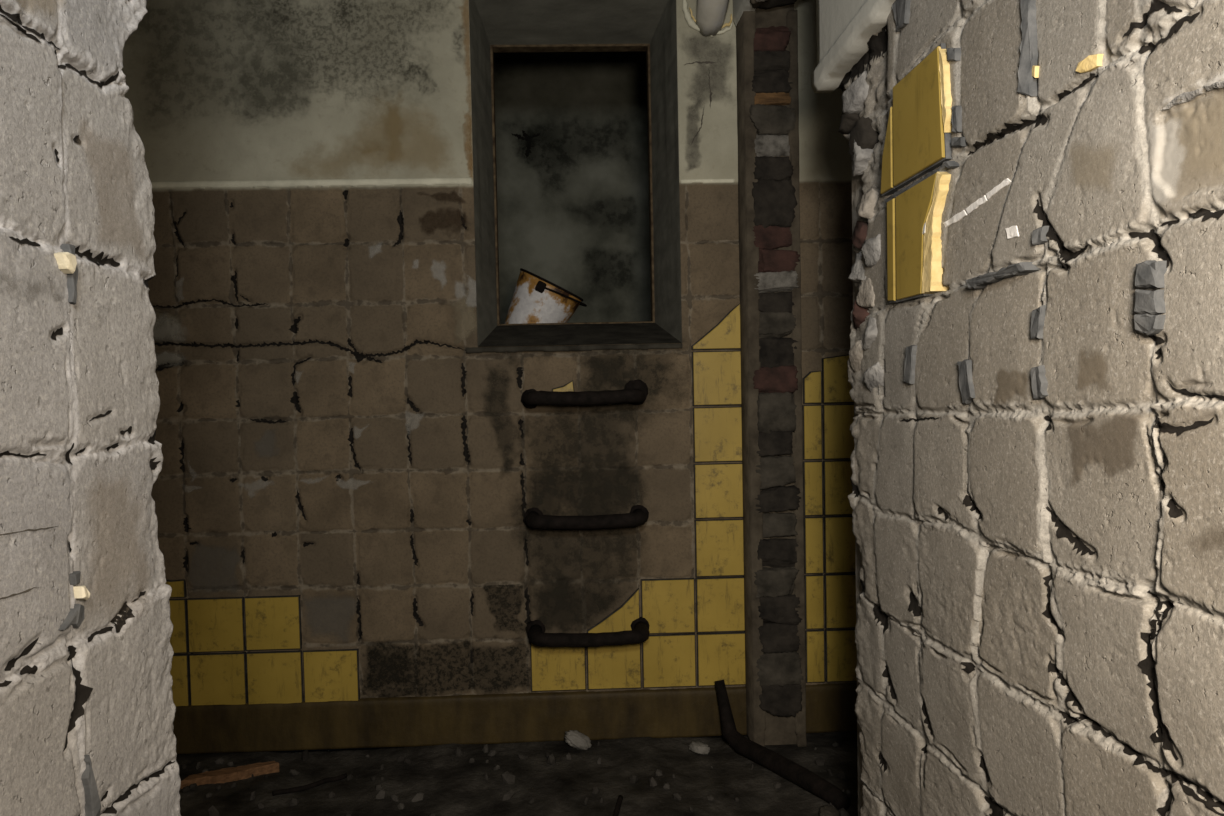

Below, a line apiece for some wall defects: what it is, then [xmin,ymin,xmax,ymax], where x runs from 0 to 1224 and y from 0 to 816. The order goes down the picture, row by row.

leakage [688,38,729,169]
spalling [750,0,796,9]
crack [1122,0,1200,57]
spalling [838,71,884,393]
crack [1129,208,1224,268]
leakage [523,349,668,629]
flaking render [749,26,803,717]
leakage [1071,417,1135,479]
crack [1148,335,1224,518]
crack [63,591,146,751]
leakage [362,584,531,697]
crack [1042,570,1224,816]